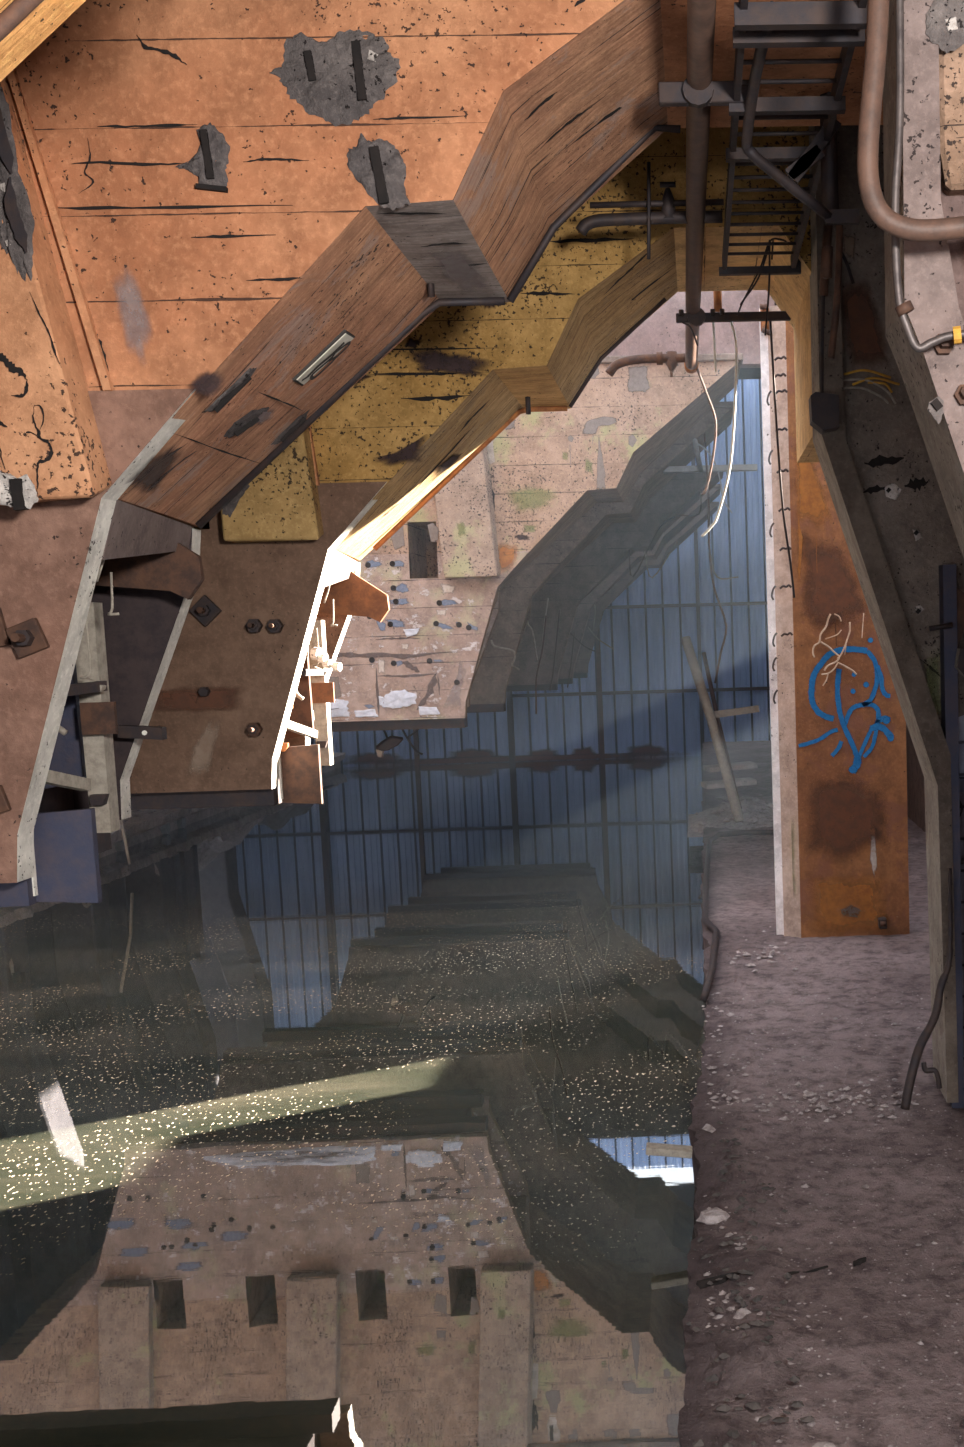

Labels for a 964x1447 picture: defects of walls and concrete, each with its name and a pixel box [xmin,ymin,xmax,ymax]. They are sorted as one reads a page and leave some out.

spalling [0,87,35,282]
crack [80,138,94,193]
spalling [176,122,230,193]
spalling [270,29,411,211]
crack [30,293,60,364]
crack [97,334,109,372]
crack [0,353,54,496]
rust [796,450,863,646]
rust [809,781,884,856]